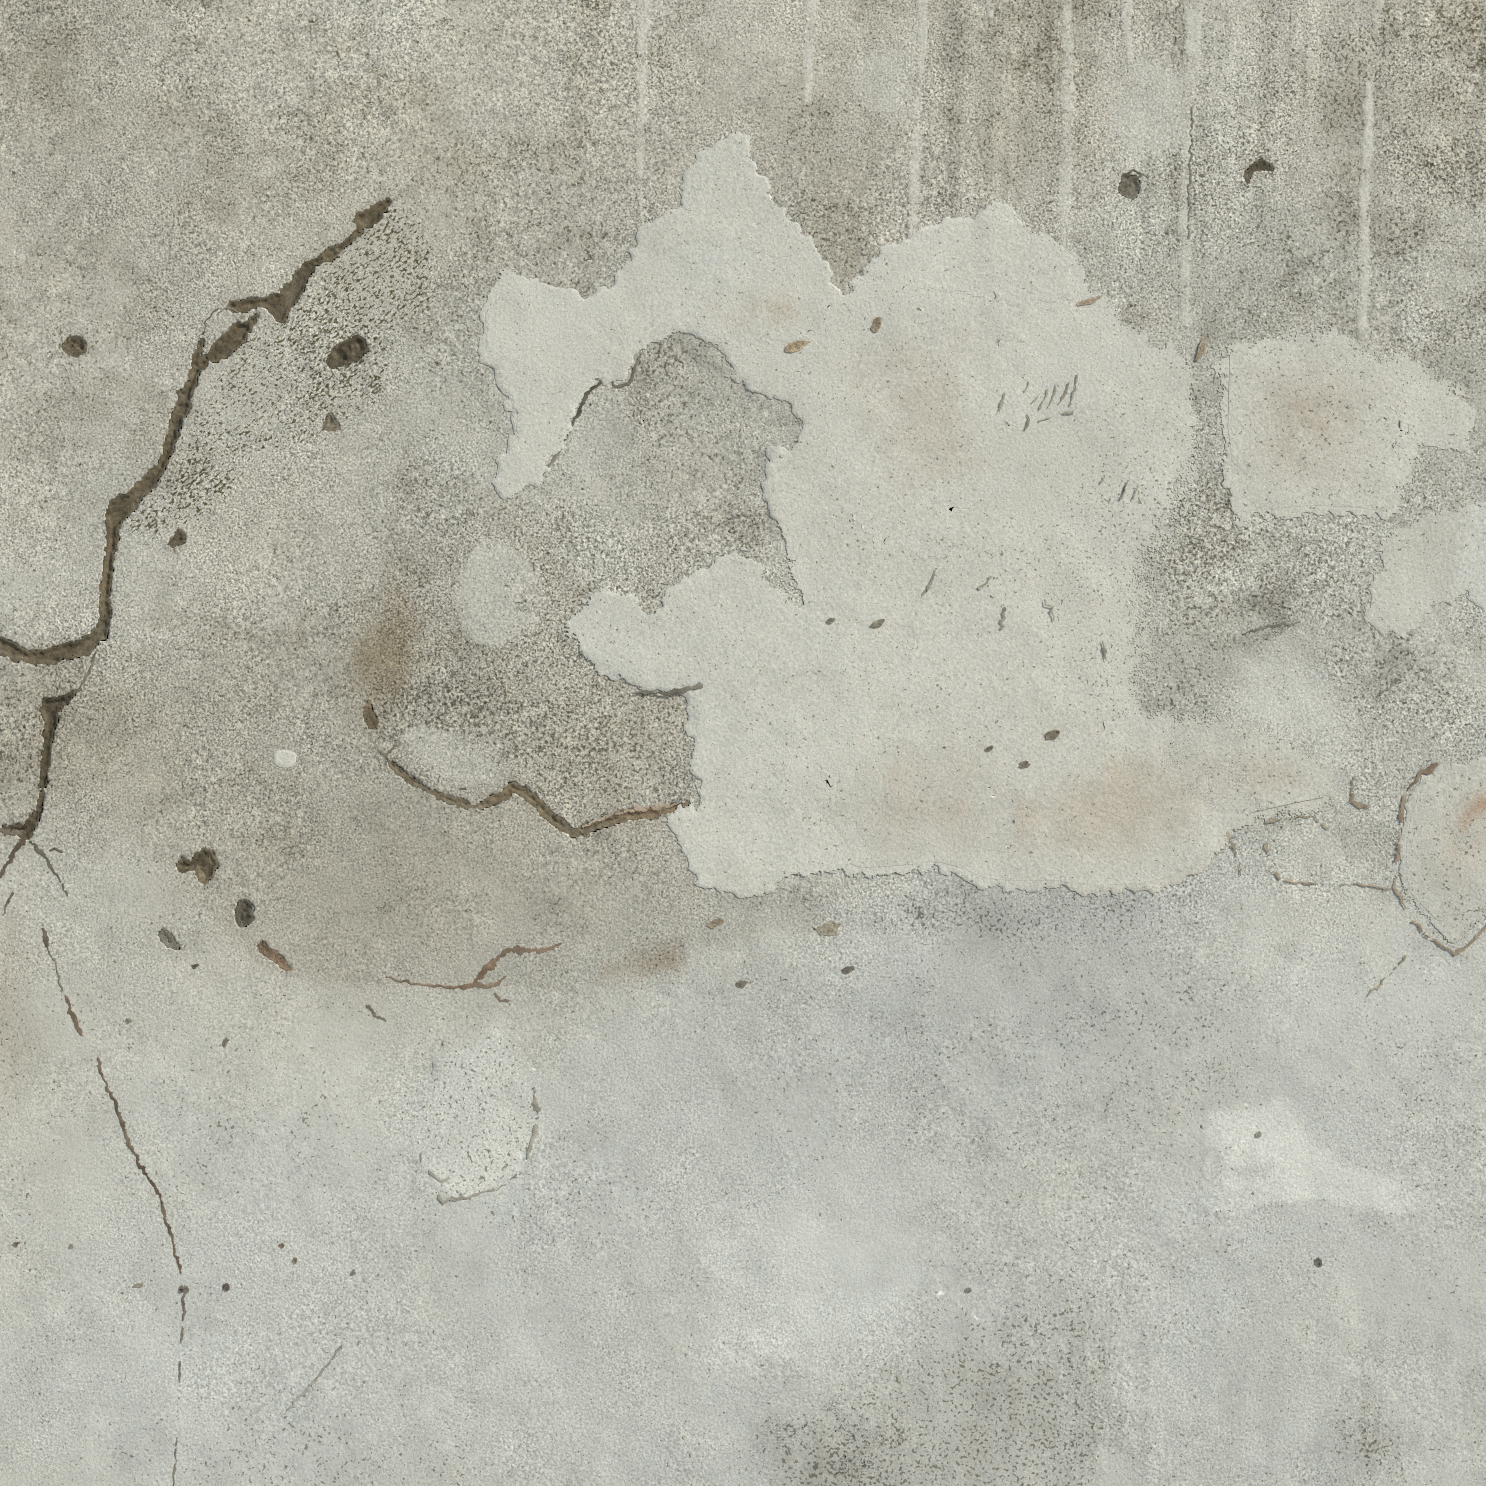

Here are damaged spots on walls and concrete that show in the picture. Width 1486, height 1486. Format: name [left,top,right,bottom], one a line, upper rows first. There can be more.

crack [0,198,392,916]
flaking render [447,530,547,654]
flaking render [477,128,1486,898]
crack [631,682,703,696]
crack [378,744,690,837]
crack [1224,762,1486,998]
crack [366,943,562,1021]
crack [41,928,187,1486]
crack [286,1346,342,1411]